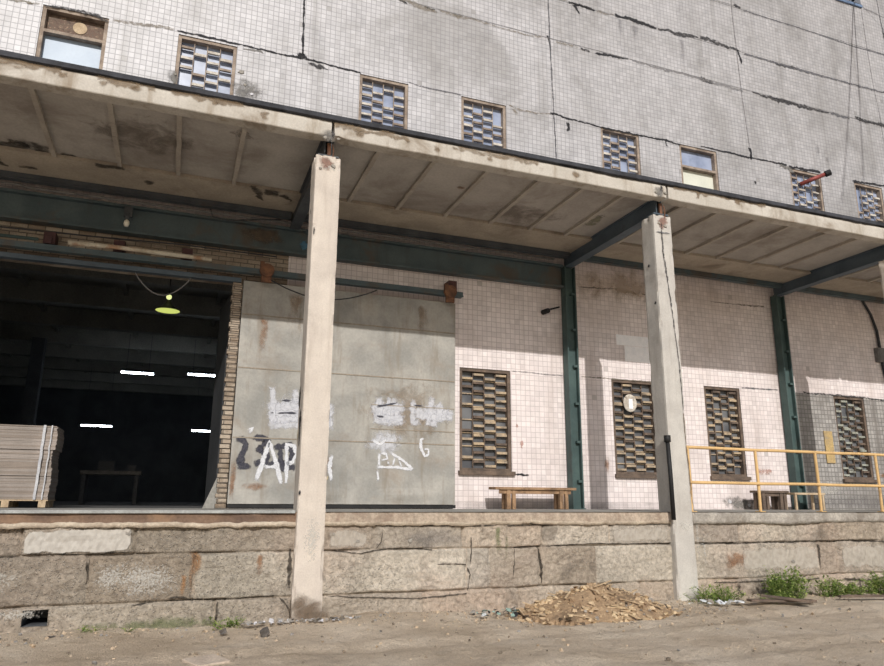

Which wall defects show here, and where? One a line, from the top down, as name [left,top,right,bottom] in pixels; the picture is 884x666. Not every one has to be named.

crack [13,0,361,73]
crack [399,0,884,127]
water stain [0,139,49,152]
crack [509,105,680,146]
crack [701,146,821,173]
water stain [251,186,292,201]
crack [330,524,670,599]